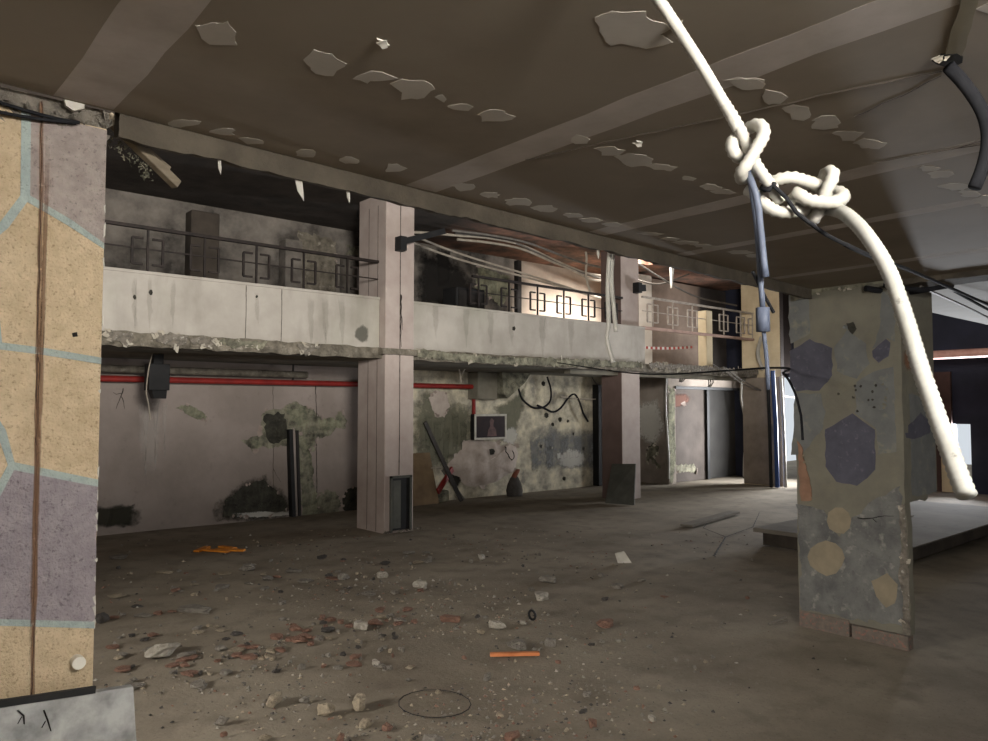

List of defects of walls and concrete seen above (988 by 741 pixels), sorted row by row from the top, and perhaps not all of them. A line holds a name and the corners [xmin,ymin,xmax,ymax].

spalling [102,316,134,348]
spalling [151,330,268,353]
spalling [297,341,321,356]
peeling [241,401,357,515]
damp [413,394,470,465]
damp [497,390,524,444]
damp [530,428,593,468]
flaking render [797,441,812,501]
peeling [216,477,289,521]
flaking render [898,503,911,635]